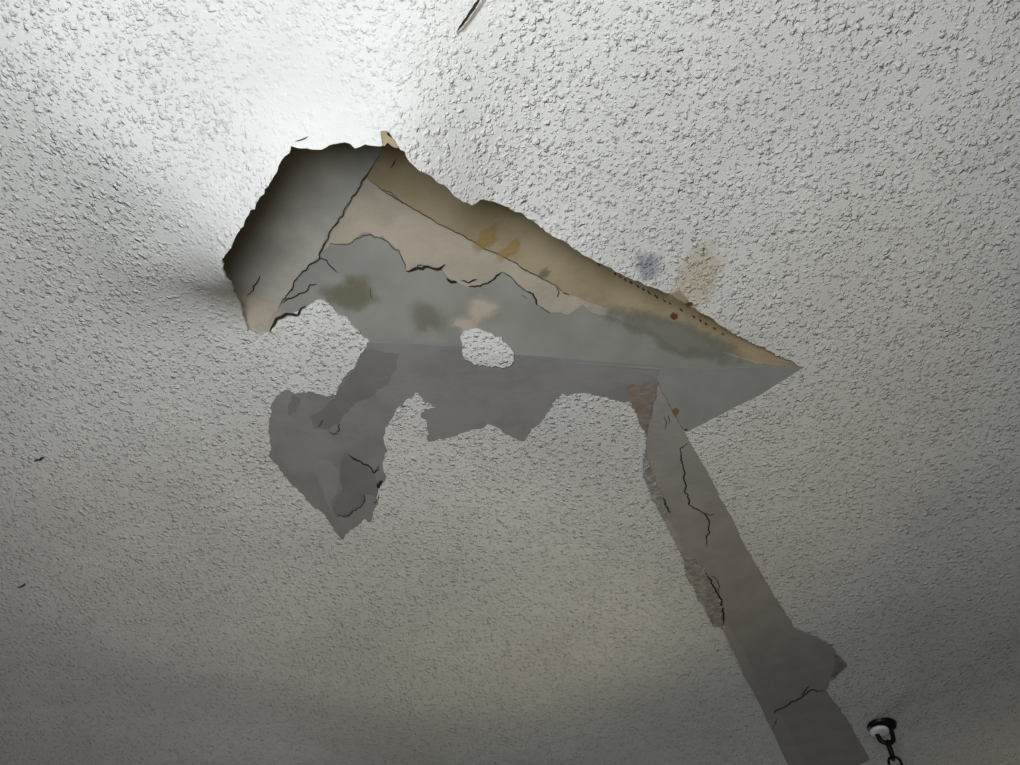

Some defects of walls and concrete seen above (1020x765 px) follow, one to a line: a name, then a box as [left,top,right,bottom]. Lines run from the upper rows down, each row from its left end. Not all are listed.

crack [456,0,486,35]
crack [338,455,382,517]
crack [663,446,713,548]
peeling [268,328,870,765]
crack [706,573,724,624]
crack [771,686,824,729]